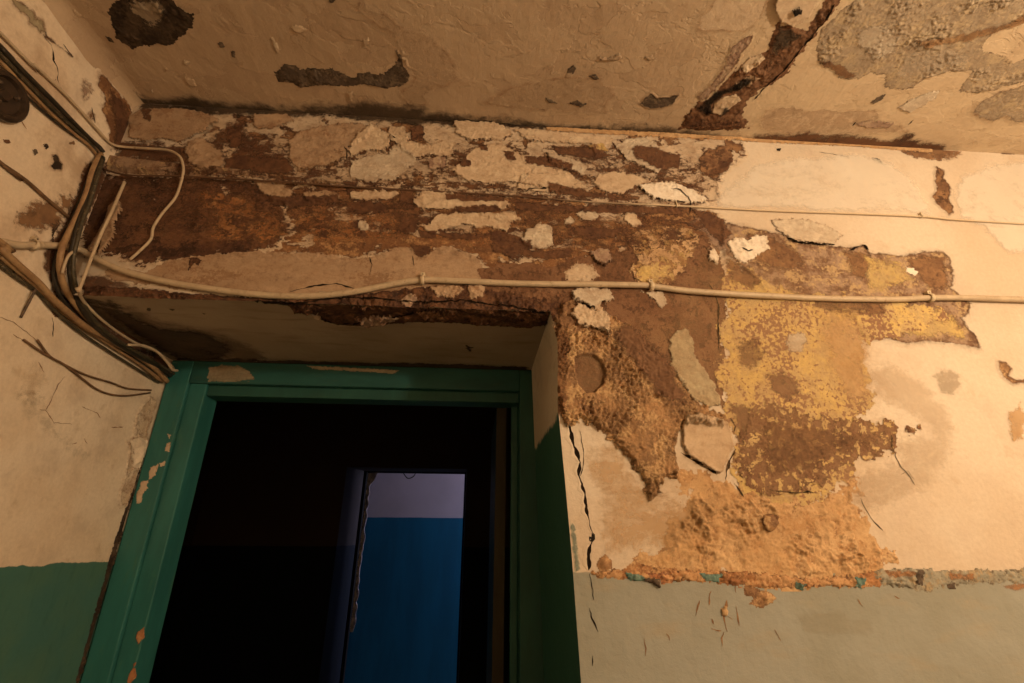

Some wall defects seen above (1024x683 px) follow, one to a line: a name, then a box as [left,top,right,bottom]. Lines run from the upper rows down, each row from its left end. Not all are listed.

spalling [106,0,194,50]
spalling [678,0,1024,138]
peeling [82,106,1024,608]
spalling [350,473,377,632]
crack [564,424,598,631]
crack [682,418,744,497]